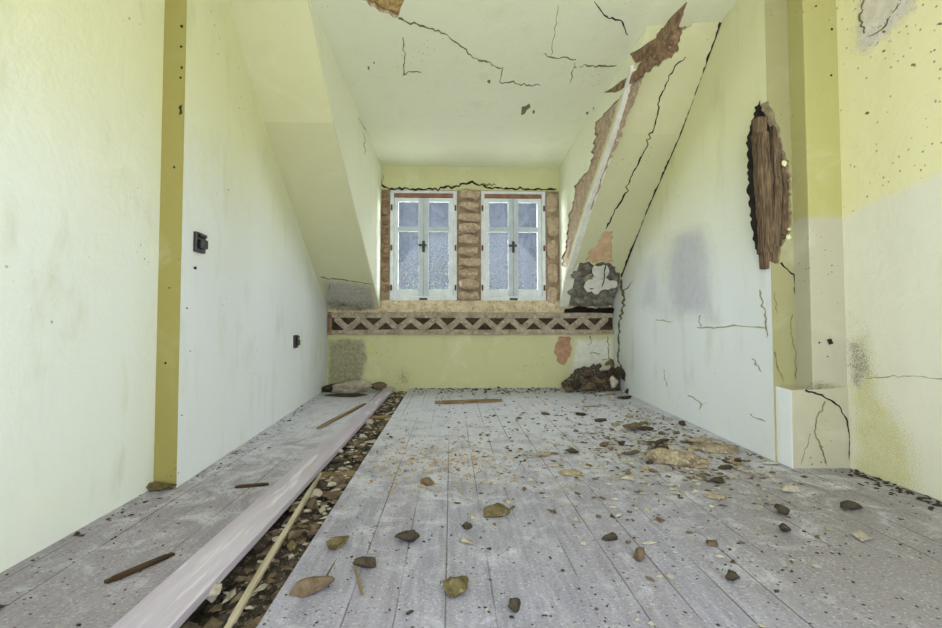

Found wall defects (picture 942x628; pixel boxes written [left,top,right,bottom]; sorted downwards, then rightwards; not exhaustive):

spalling [369,0,403,15]
crack [398,17,541,86]
crack [545,11,617,82]
crack [594,1,628,35]
peeling [850,0,918,55]
spalling [546,2,687,313]
crack [588,22,721,381]
spalling [746,101,792,270]
peeling [554,336,613,374]
crack [697,262,850,465]
crack [866,373,942,381]